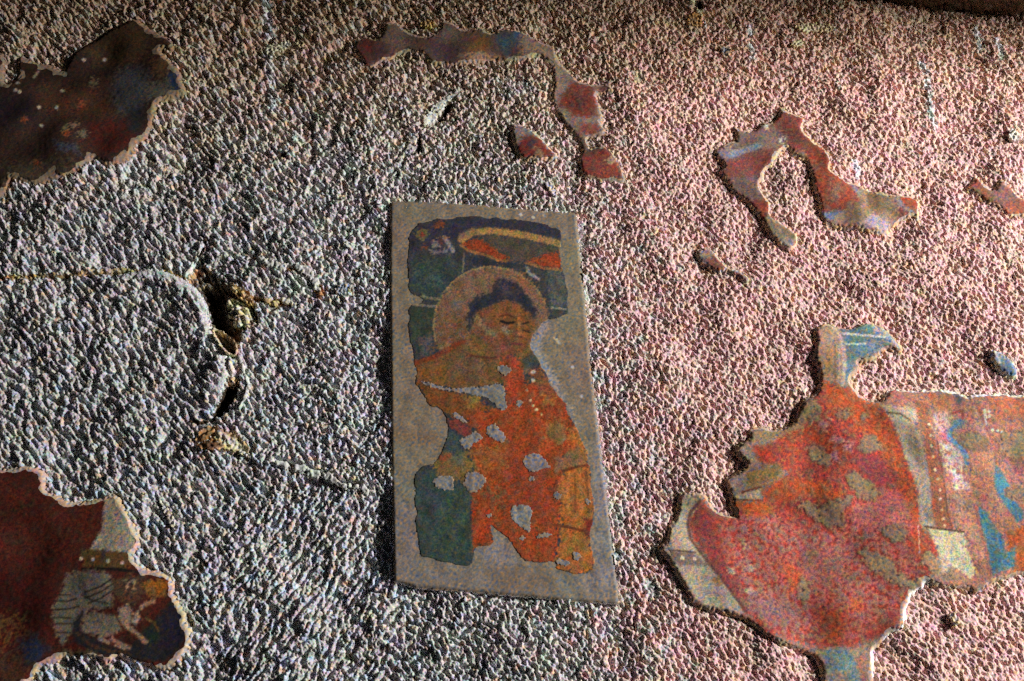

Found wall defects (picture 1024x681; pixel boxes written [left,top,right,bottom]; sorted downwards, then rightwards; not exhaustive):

peeling [421,365,523,411]
peeling [453,412,506,450]
peeling [432,471,486,493]
peeling [522,453,550,482]
peeling [159,499,176,528]
peeling [509,504,552,541]
peeling [556,552,582,567]